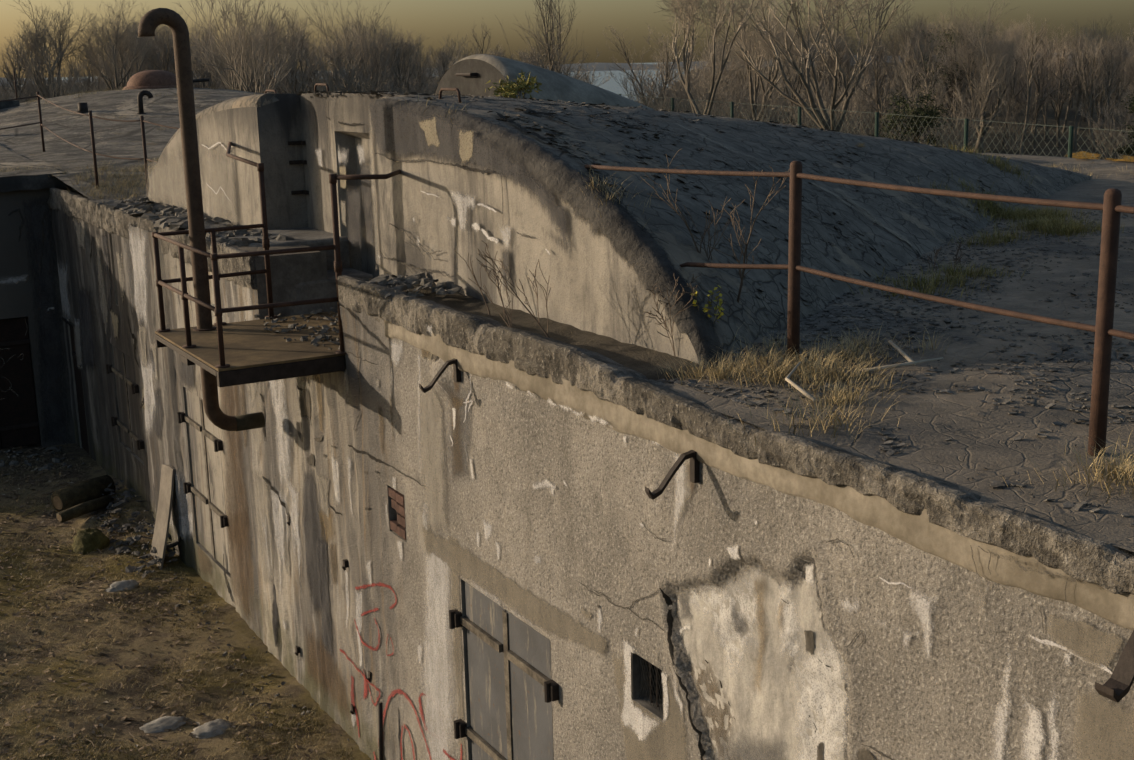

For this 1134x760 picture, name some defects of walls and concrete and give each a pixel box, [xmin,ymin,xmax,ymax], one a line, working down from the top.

damp [338,146,380,258]
damp [368,102,569,255]
damp [448,192,510,290]
peeling [295,90,1103,446]
damp [170,473,193,536]
damp [249,378,371,666]
peeling [423,528,686,760]
crack [578,581,706,760]
peeling [678,565,847,760]